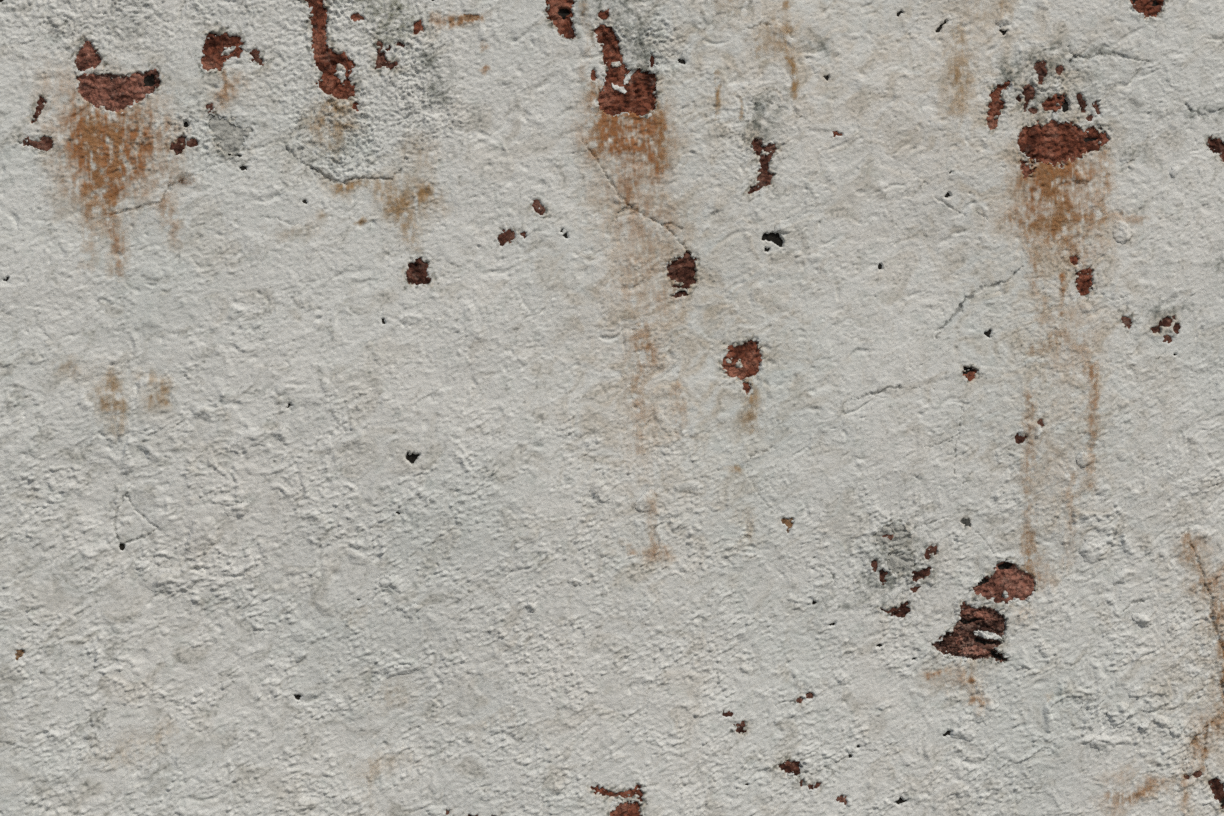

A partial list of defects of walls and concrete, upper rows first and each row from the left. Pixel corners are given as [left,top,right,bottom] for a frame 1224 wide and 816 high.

rust [60,103,167,266]
peeling [74,41,162,114]
peeling [200,28,264,74]
peeling [303,0,359,112]
peeling [543,0,661,119]
rust [589,92,668,205]
peeling [986,60,1113,178]
rust [1017,157,1095,240]
peeling [1130,0,1167,21]
peeling [663,249,698,298]
peeling [718,338,764,395]
peeling [931,557,1038,665]